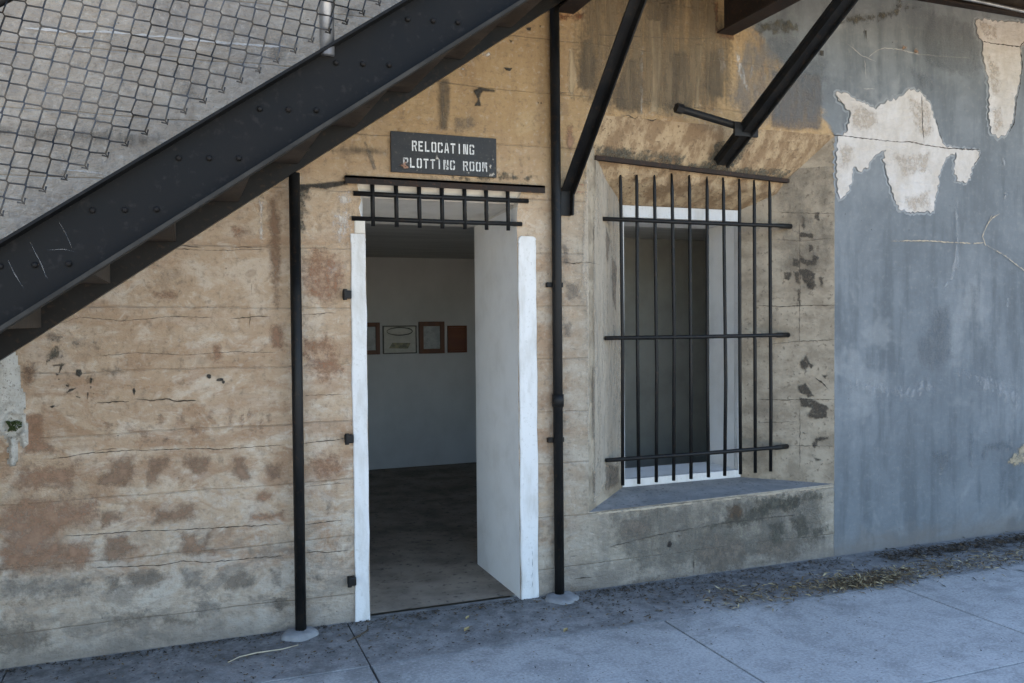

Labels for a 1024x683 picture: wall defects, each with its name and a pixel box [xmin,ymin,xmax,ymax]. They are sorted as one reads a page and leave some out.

peeling [972,16,1024,141]
peeling [832,87,981,216]
crack [903,215,1024,271]